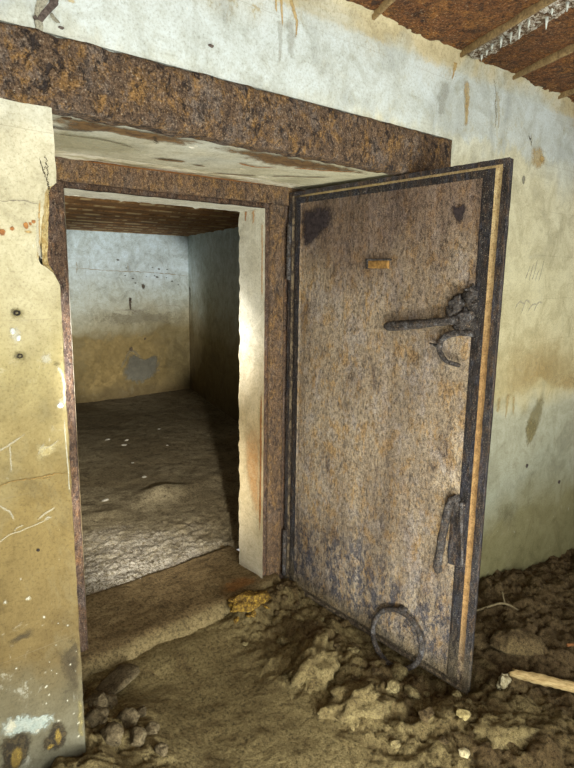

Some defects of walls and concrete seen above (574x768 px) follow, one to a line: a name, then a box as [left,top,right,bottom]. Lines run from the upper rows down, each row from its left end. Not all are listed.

rust [275,0,298,35]
spalling [36,185,56,277]
leakage [526,400,542,442]
leakage [1,715,67,768]